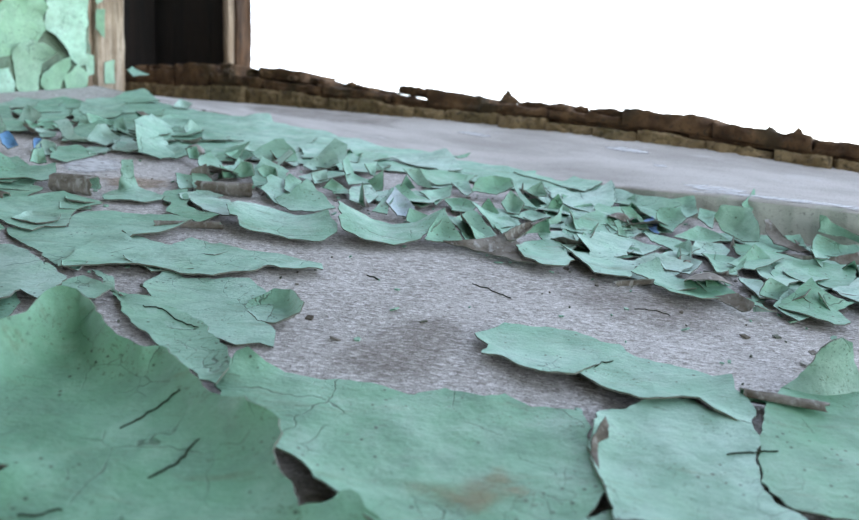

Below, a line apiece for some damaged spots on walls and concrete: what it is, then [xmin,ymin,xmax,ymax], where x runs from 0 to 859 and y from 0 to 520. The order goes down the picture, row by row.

peeling [95,0,105,38]
peeling [0,0,94,93]
peeling [104,60,115,84]
peeling [0,88,859,385]
crack [143,305,199,328]
crack [120,389,180,428]
peeling [0,285,859,520]
crack [148,438,200,479]
crack [17,508,62,517]